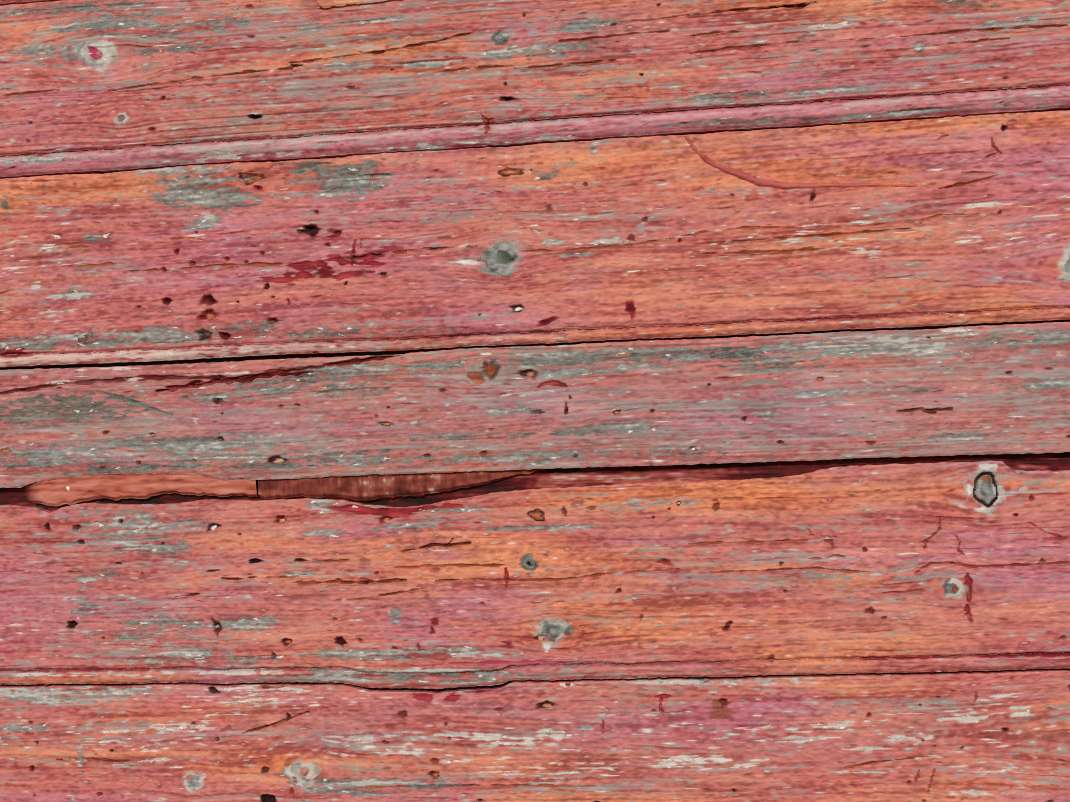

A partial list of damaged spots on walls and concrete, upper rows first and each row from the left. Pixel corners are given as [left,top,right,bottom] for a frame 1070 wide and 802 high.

peeling [138,153,266,231]
peeling [277,151,391,197]
crack [519,137,1002,255]
peeling [0,369,137,426]
peeling [182,359,465,403]
peeling [507,328,1070,390]
spalling [897,387,953,414]
peeling [0,432,586,476]
peeling [99,720,215,763]
peeling [324,725,592,763]
peeling [649,755,757,768]
peeling [306,778,464,796]